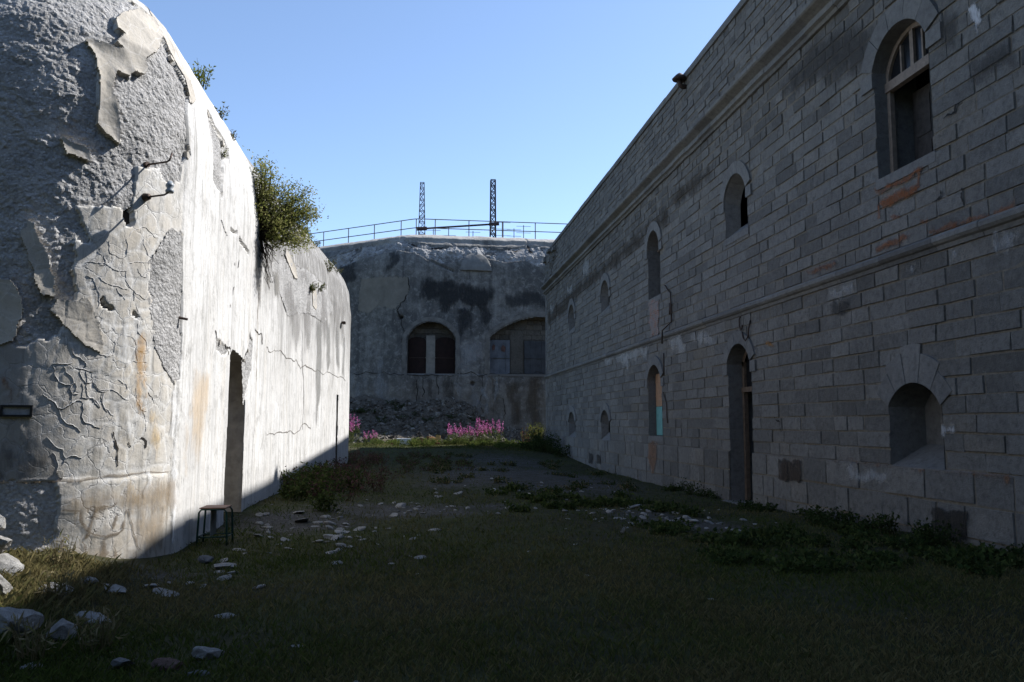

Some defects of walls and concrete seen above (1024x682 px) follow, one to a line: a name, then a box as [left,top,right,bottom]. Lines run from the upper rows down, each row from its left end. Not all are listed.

spalling [0,0,196,353]
crack [1,208,166,484]
spalling [148,228,184,385]
spalling [216,337,252,405]
crack [255,304,544,415]
water stain [421,278,494,334]